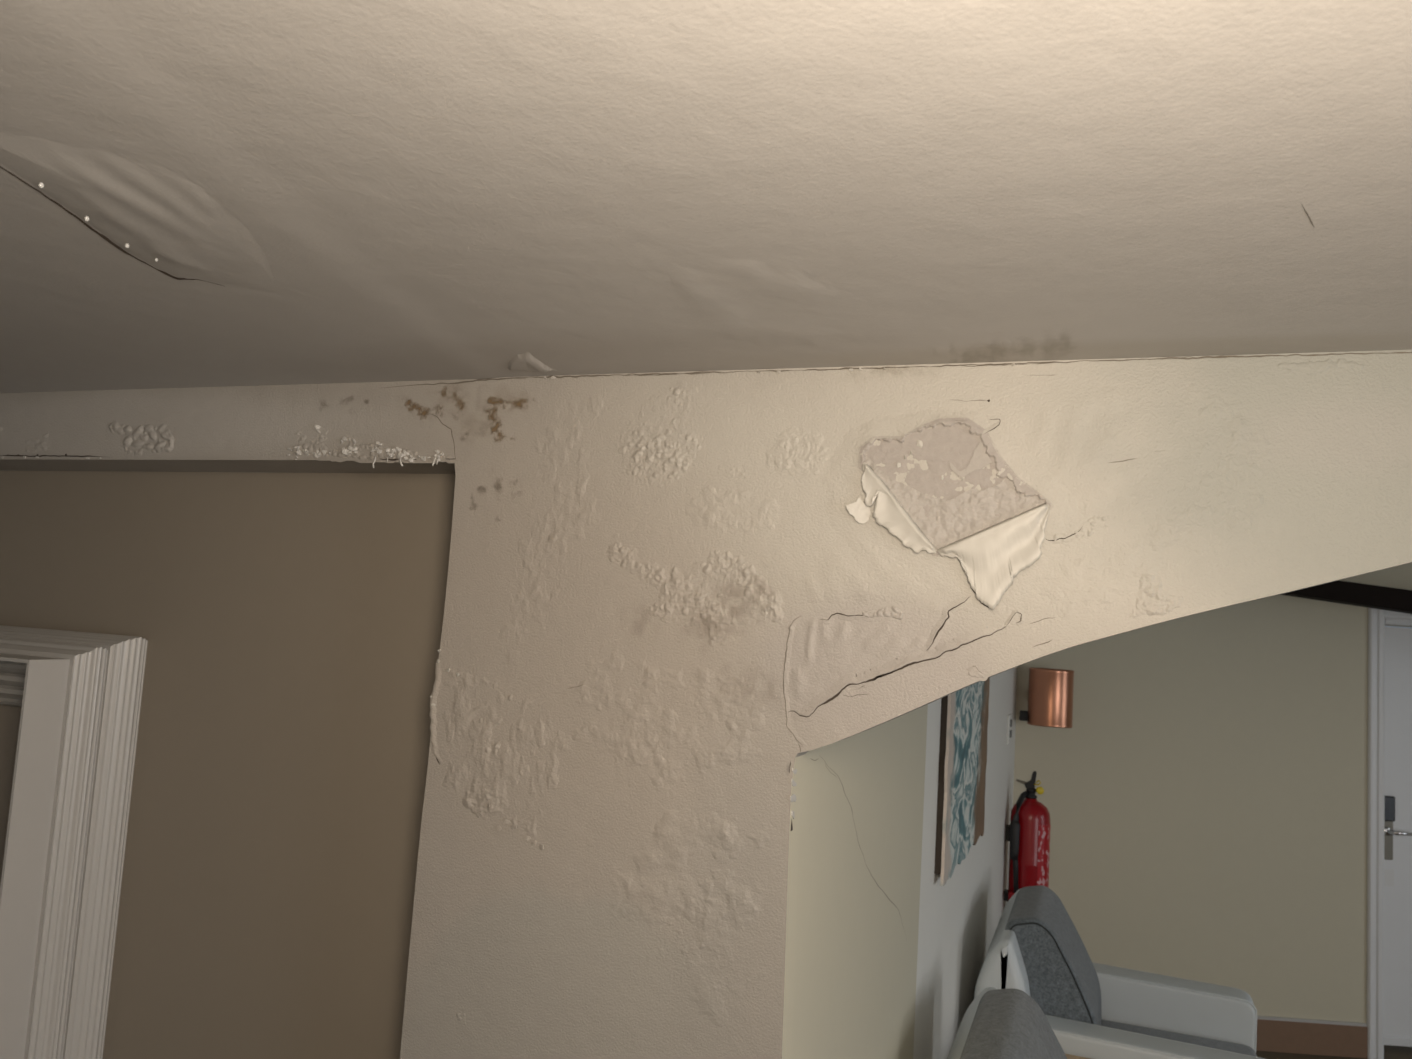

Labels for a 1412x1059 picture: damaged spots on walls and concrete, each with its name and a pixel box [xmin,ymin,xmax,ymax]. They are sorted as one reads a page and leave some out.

corrosion [487,397,526,441]
peeling [286,425,454,468]
peeling [822,410,1074,615]